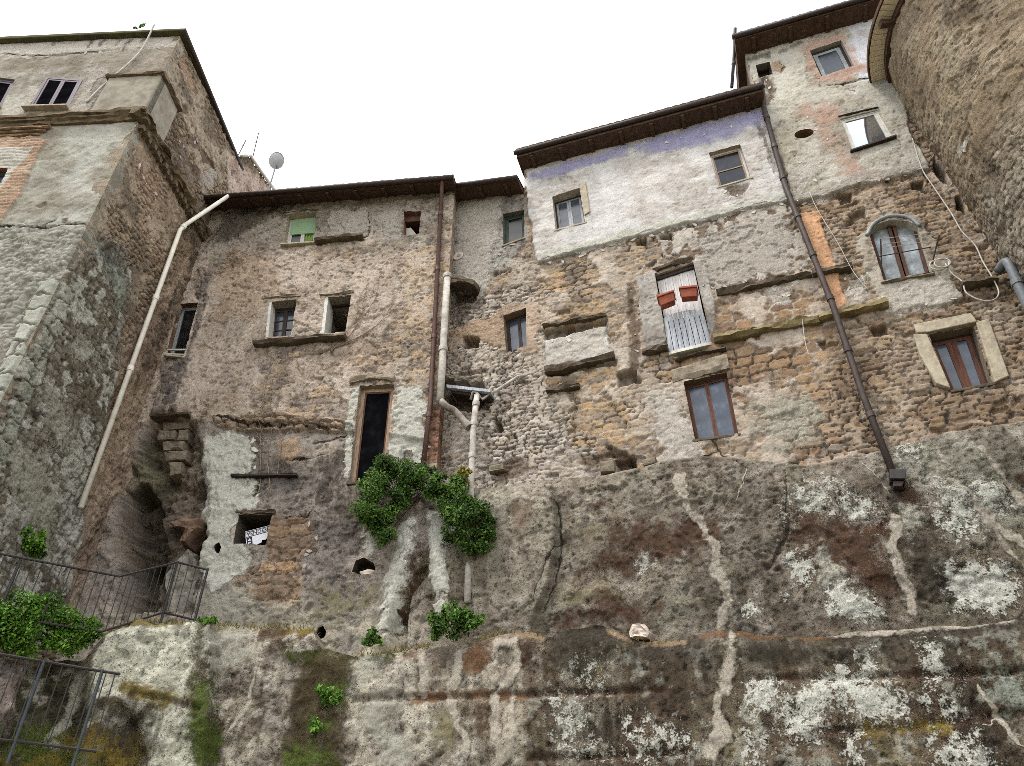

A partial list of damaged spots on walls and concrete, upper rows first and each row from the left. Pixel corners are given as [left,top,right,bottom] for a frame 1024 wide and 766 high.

flaking render [453,196,516,285]
flaking render [540,103,930,306]
flaking render [454,315,504,350]
flaking render [543,327,609,364]
flaking render [627,284,642,372]
flaking render [881,279,958,317]
flaking render [199,430,261,592]
crack [531,501,563,612]